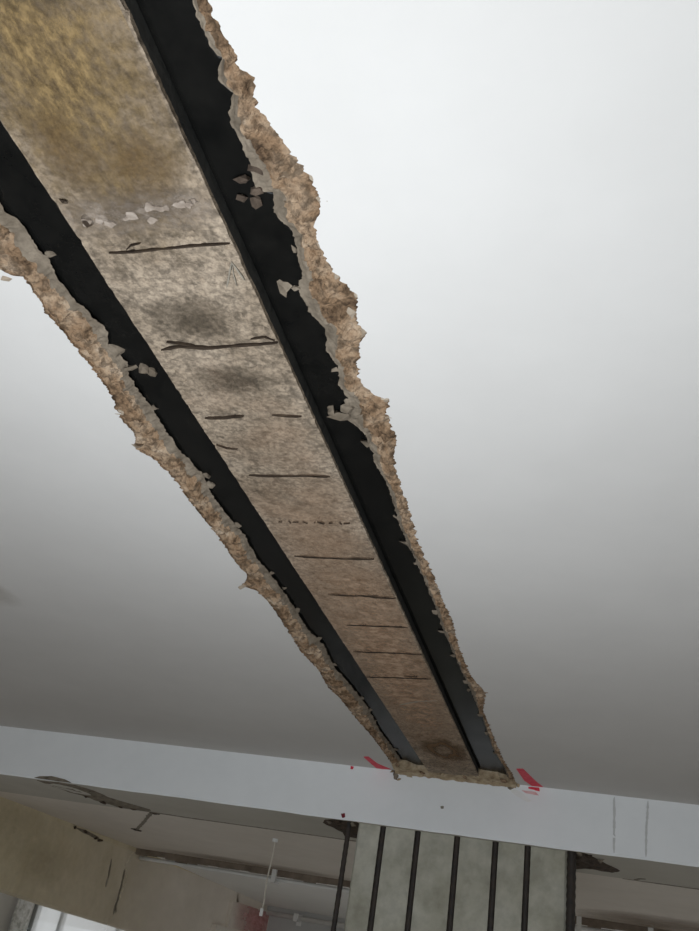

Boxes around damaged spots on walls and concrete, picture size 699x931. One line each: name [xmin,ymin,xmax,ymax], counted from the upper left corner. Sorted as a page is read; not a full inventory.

crack [109,242,245,288]
crack [161,336,278,351]
spalling [0,0,520,790]
crack [204,413,244,421]
crack [272,412,302,420]
crack [249,472,330,480]
crack [278,518,350,526]
crack [294,553,374,561]
crack [328,592,396,600]
crack [347,622,408,630]
crack [353,650,431,680]